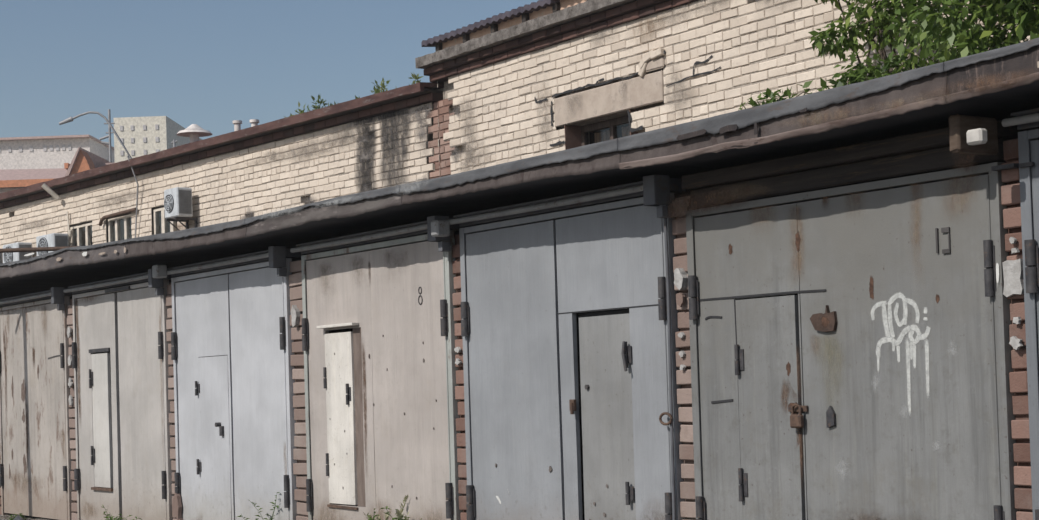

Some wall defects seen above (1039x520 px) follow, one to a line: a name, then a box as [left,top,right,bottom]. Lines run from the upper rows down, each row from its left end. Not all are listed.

crack [666,55,721,87]
water stain [356,107,429,192]
peeling [3,332,28,478]
spalling [33,348,73,406]
rust [782,352,799,414]